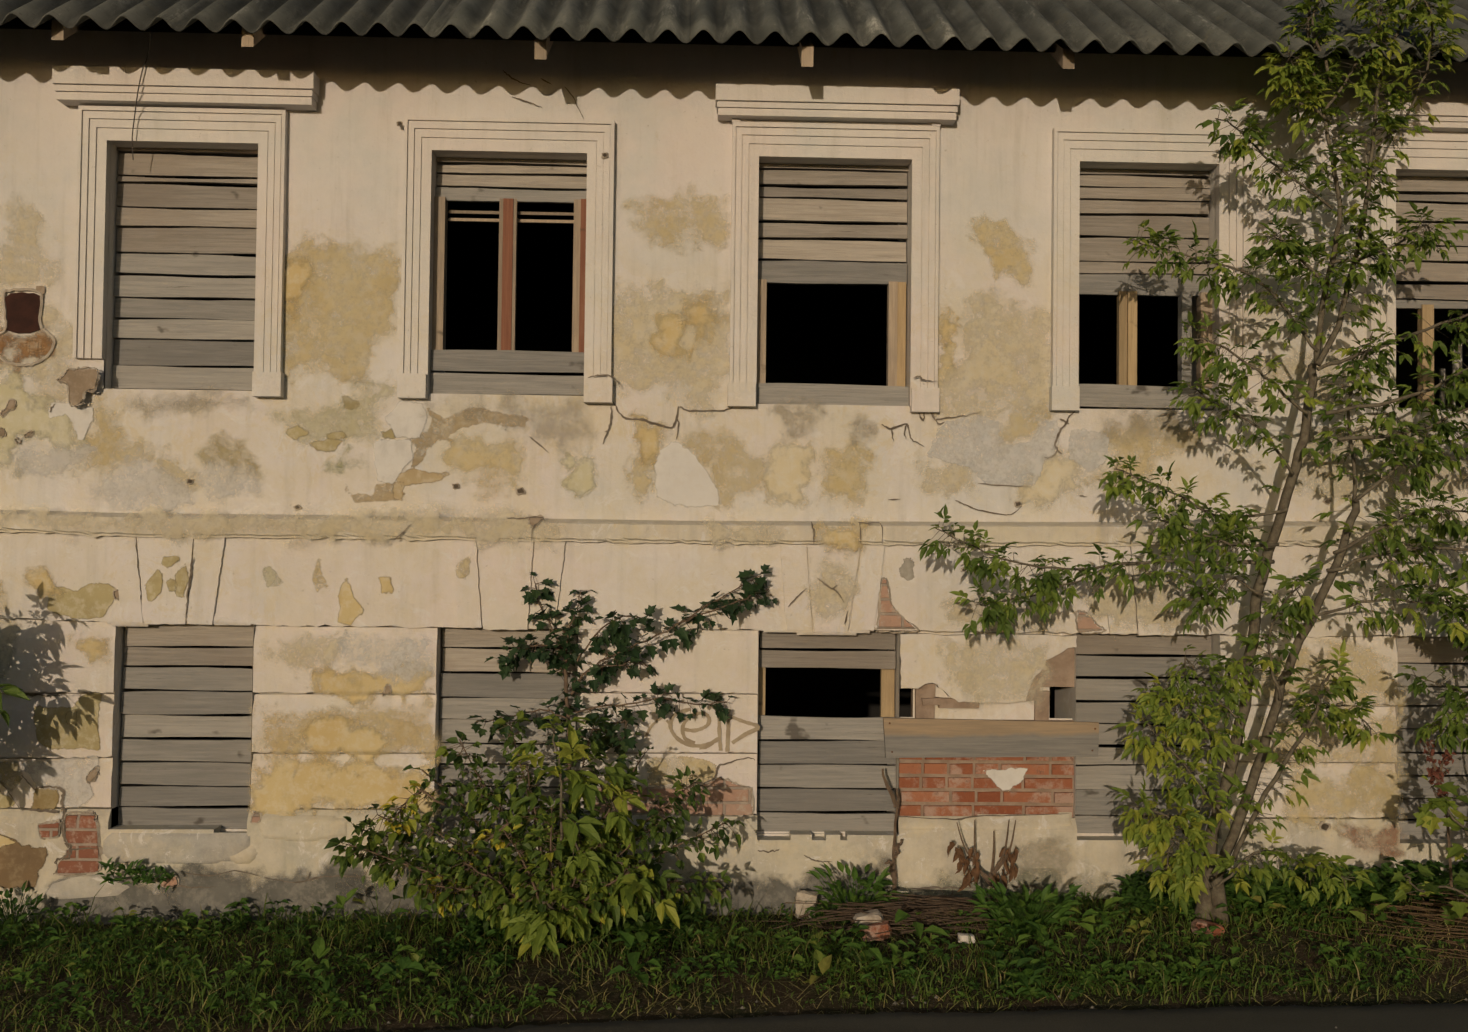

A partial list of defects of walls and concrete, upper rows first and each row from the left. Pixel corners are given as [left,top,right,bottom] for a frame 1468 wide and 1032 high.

peeling [283,240,399,410]
peeling [0,366,101,476]
peeling [352,400,528,503]
peeling [627,414,719,507]
peeling [25,566,119,619]
peeling [146,556,189,601]
peeling [250,562,439,824]
flaking render [869,558,920,634]
spalling [911,683,990,720]
peeling [1026,567,1191,721]
peeling [0,692,103,889]
flaking render [898,757,1074,817]